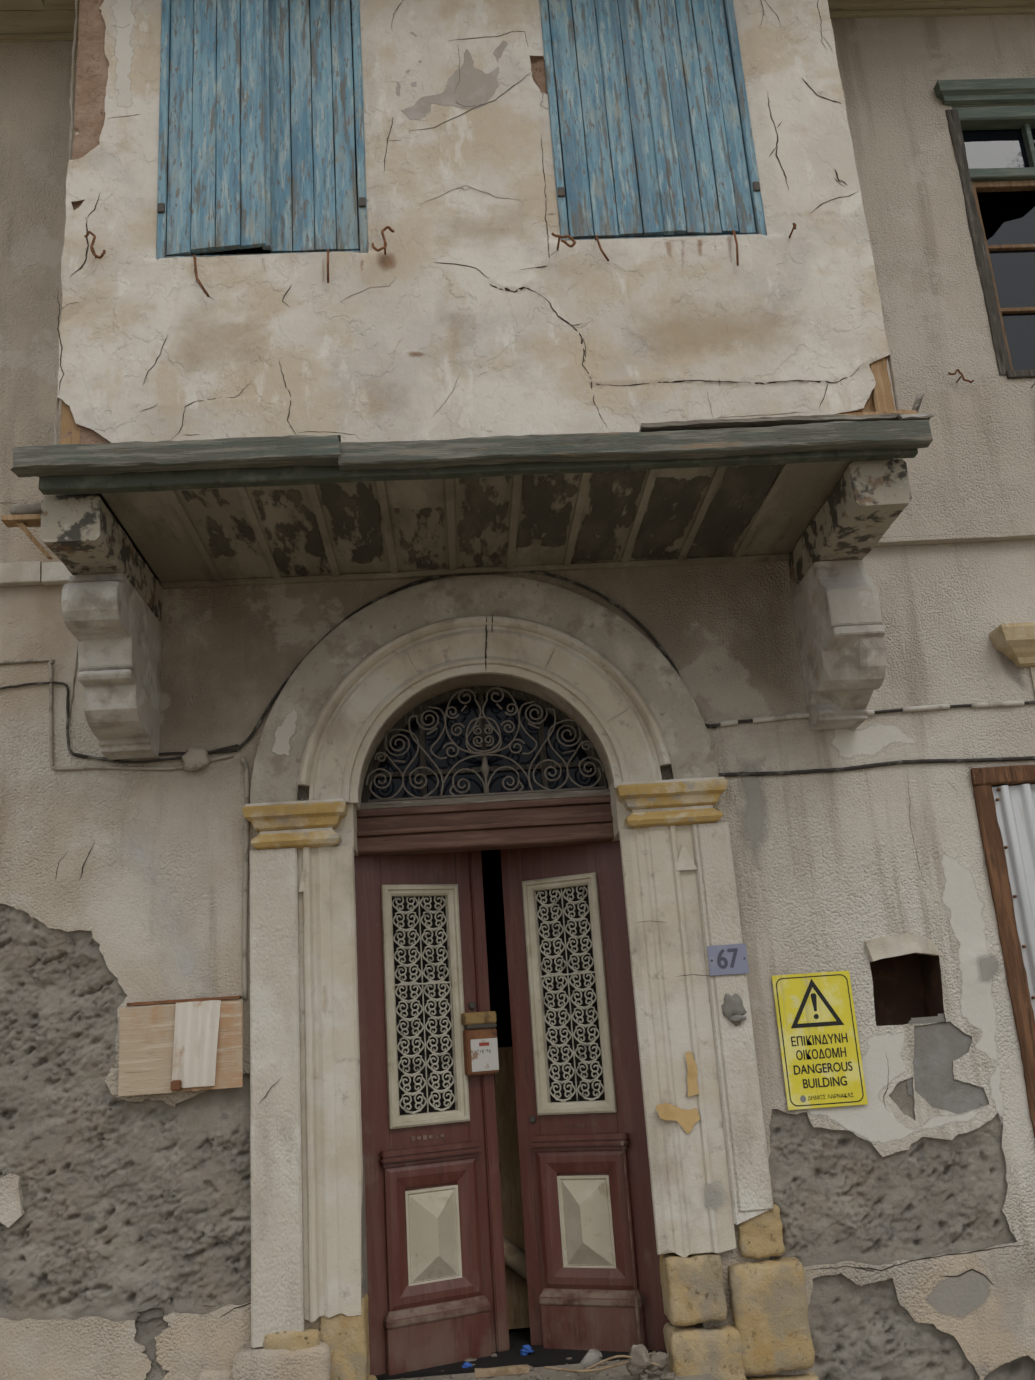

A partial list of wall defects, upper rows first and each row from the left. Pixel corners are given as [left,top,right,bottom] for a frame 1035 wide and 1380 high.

flaking render [72,0,135,160]
peeling [396,41,507,120]
crack [383,31,548,173]
crack [768,98,855,212]
crack [802,78,842,104]
crack [421,141,864,427]
peeling [182,464,782,576]
crack [485,615,493,667]
flaking render [0,904,251,1380]
peeling [656,1052,700,1133]
flaking render [768,854,1035,1380]